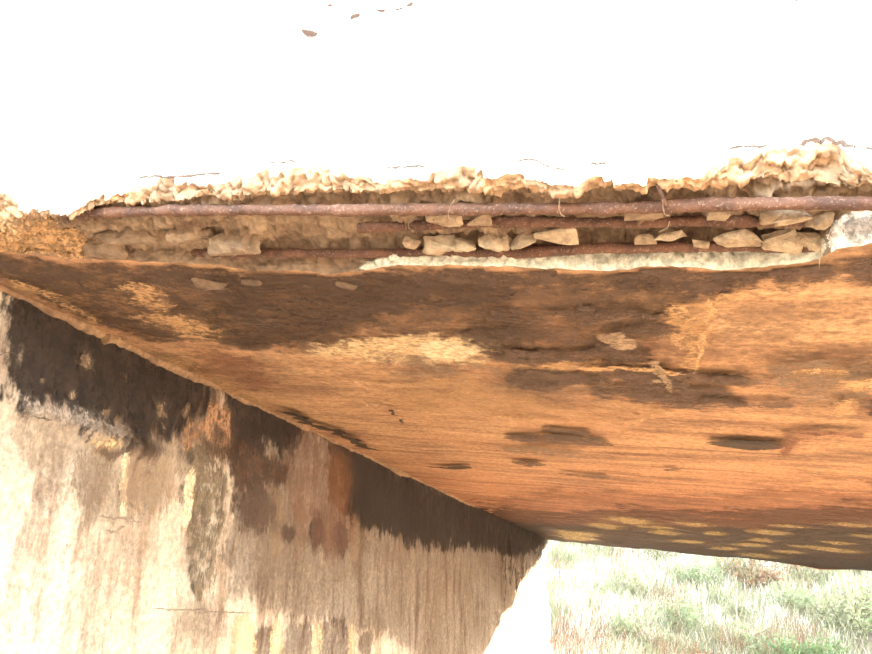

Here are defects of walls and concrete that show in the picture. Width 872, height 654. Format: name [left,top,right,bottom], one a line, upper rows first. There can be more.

spalling [0,142,872,291]
damp [0,210,872,543]
damp [307,438,872,571]